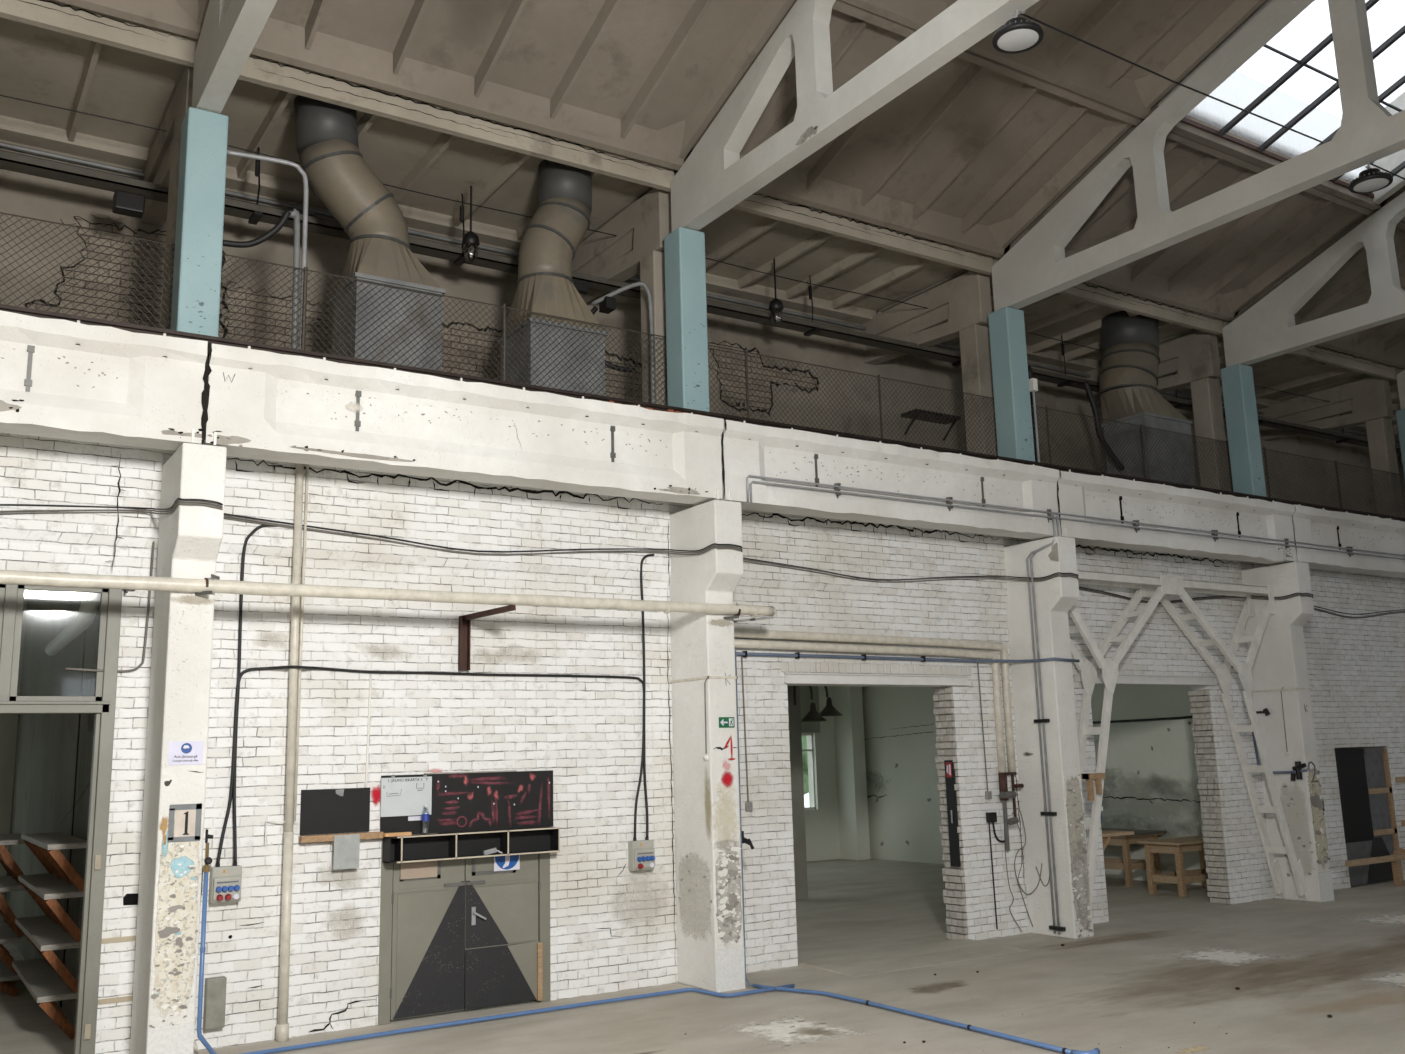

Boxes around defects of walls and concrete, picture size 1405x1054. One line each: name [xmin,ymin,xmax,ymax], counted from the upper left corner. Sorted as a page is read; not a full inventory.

flaking render [24,214,166,328]
flaking render [685,324,819,417]
crack [191,342,670,581]
crack [667,616,676,966]
peeling [1283,767,1330,875]
peeling [149,823,200,1028]
peeling [677,840,742,945]